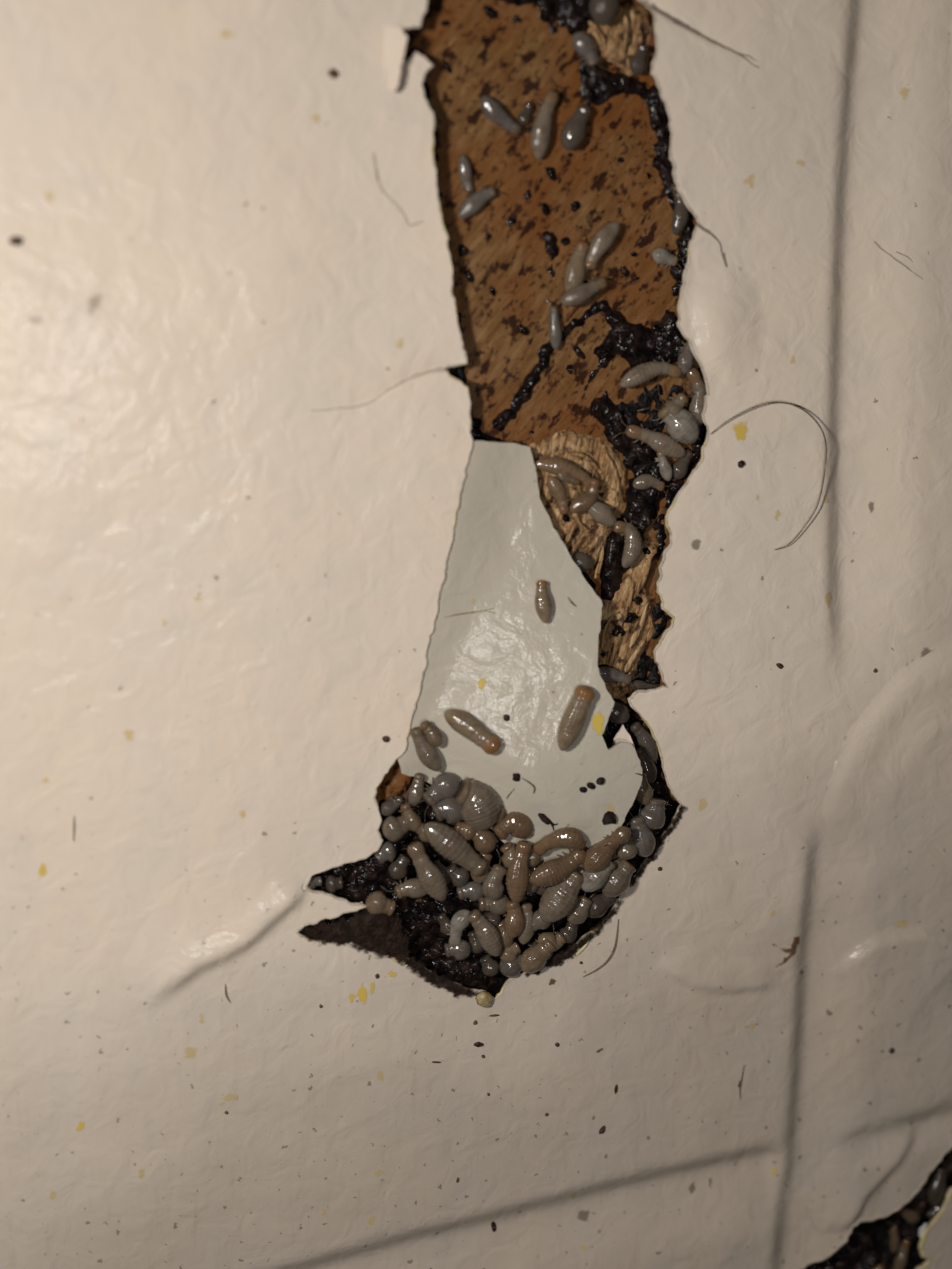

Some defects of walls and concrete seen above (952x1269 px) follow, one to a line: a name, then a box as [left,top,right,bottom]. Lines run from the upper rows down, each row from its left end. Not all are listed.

peeling [296,0,710,1000]
peeling [798,1144,952,1269]